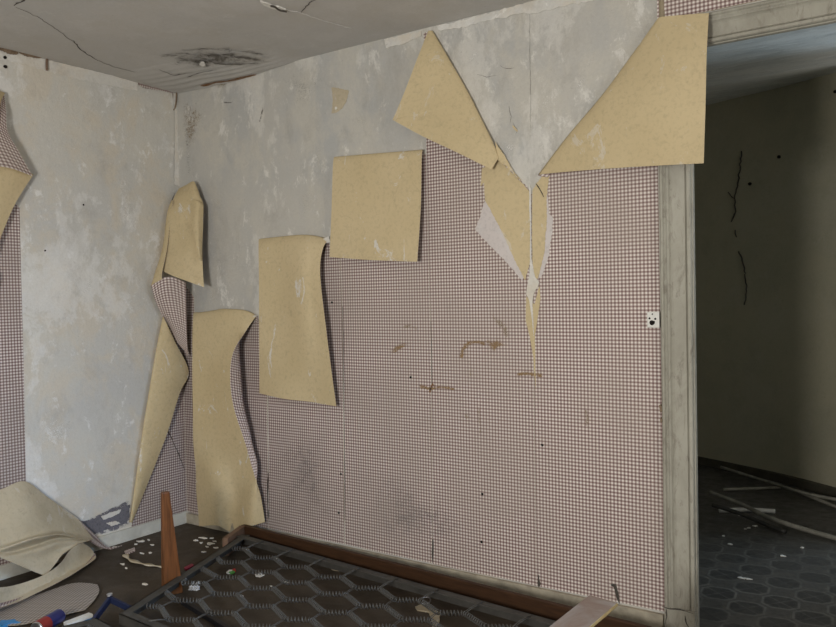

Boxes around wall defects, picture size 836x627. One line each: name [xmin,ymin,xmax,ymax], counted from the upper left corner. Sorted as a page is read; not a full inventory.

crack [14,0,133,72]
spalling [384,31,422,48]
crack [728,151,747,305]